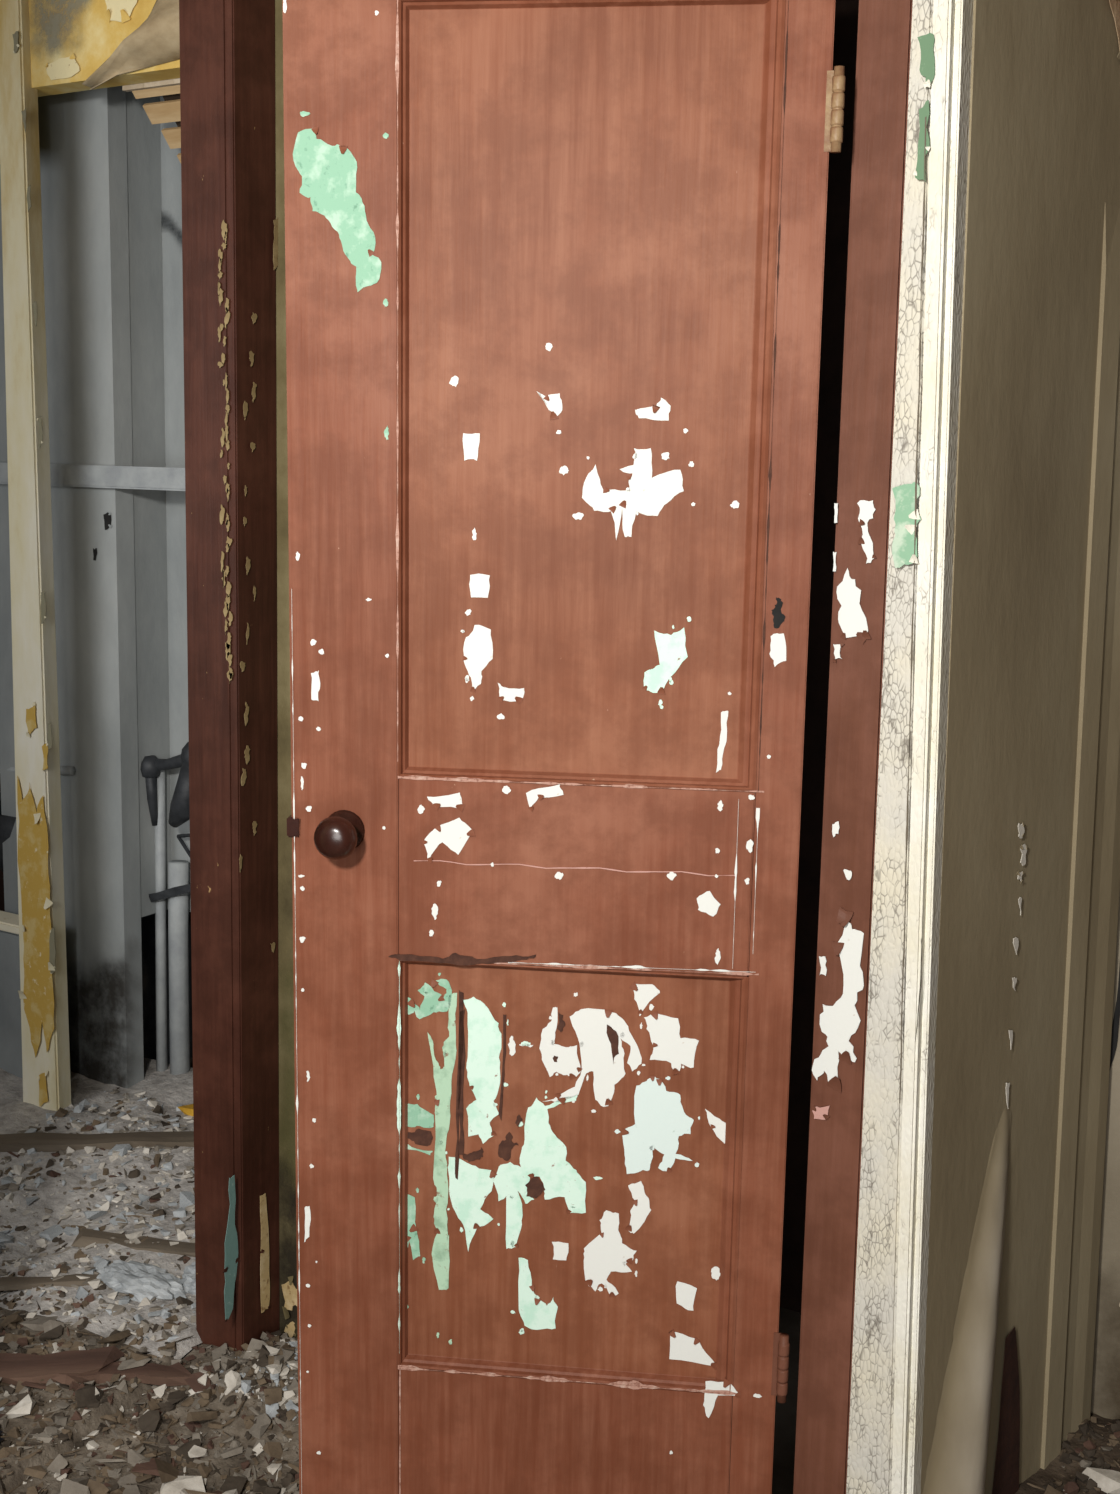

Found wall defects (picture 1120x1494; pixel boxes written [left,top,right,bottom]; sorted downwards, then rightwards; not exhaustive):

peeling [293,111,388,307]
peeling [463,433,480,461]
peeling [537,392,562,434]
peeling [572,448,695,539]
peeling [635,398,688,433]
peeling [857,482,921,568]
peeling [460,574,525,719]
peeling [642,616,691,709]
peeling [832,552,871,663]
peeling [17,776,56,1107]
peeling [812,907,864,1120]
peeling [407,973,726,1335]